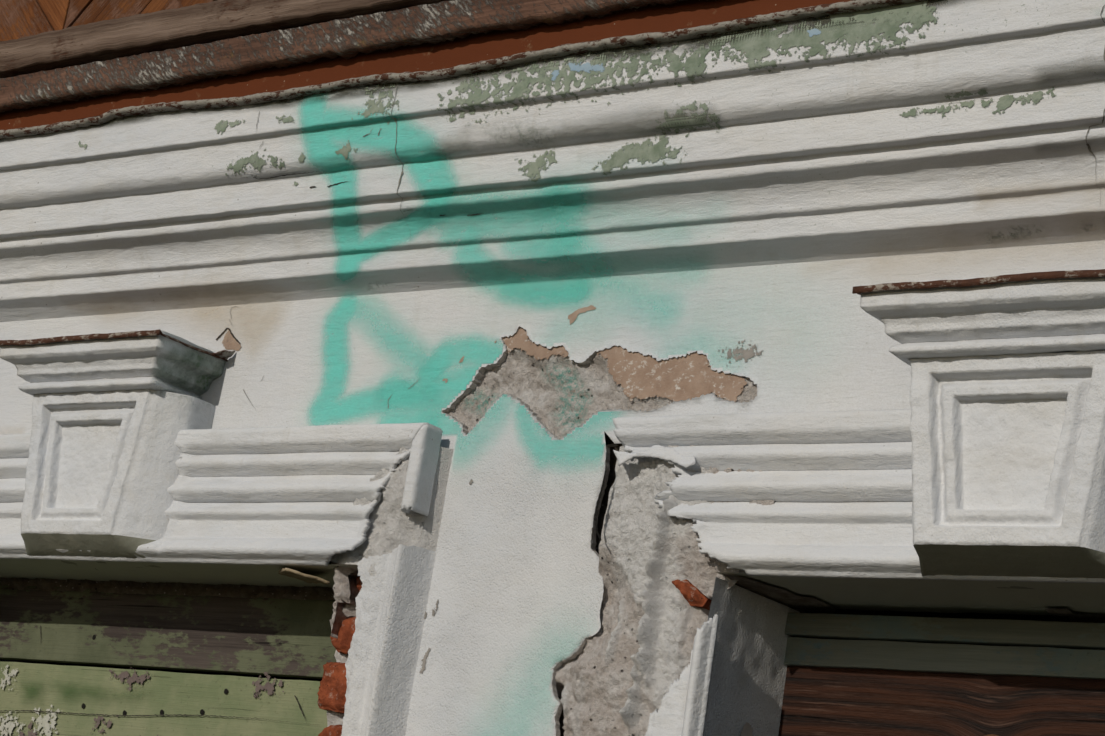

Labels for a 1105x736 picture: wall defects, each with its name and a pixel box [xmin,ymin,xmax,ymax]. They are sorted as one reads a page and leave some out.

peeling [214,119,245,135]
peeling [225,148,286,177]
peeling [514,148,557,182]
peeling [592,100,727,175]
peeling [431,0,938,132]
peeling [899,87,1055,118]
crack [1086,109,1105,203]
spalling [447,328,757,439]
spalling [278,447,454,736]
spalling [555,445,837,736]